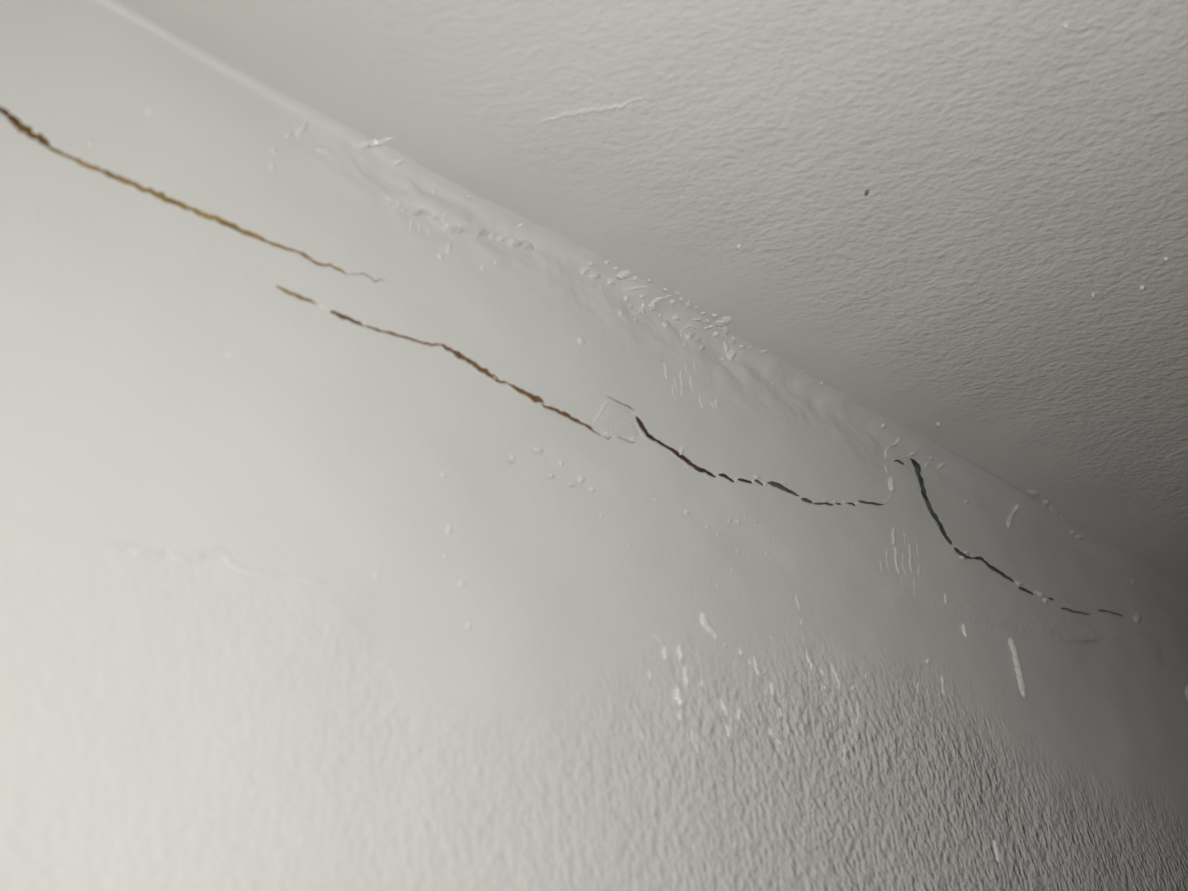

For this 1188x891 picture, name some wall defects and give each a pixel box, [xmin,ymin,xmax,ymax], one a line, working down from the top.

crack [0,105,383,282]
crack [276,286,884,506]
crack [894,459,1141,623]